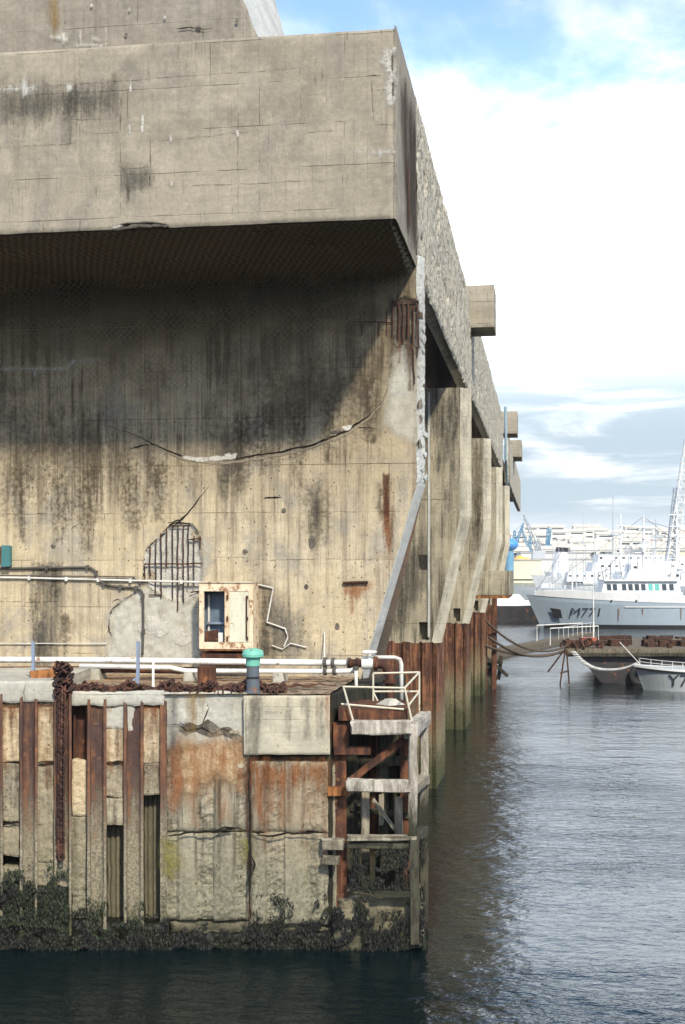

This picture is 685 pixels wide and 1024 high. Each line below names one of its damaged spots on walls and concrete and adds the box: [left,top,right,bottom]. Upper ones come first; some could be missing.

damp [1,79,110,120]
spalling [380,47,397,106]
rust [396,302,419,368]
crack [105,347,396,464]
rust [380,475,391,546]
peeling [108,524,203,658]
crack [107,489,207,650]
rust [343,581,368,597]
peeling [176,719,253,801]
rust [245,756,326,828]
crack [162,758,328,909]